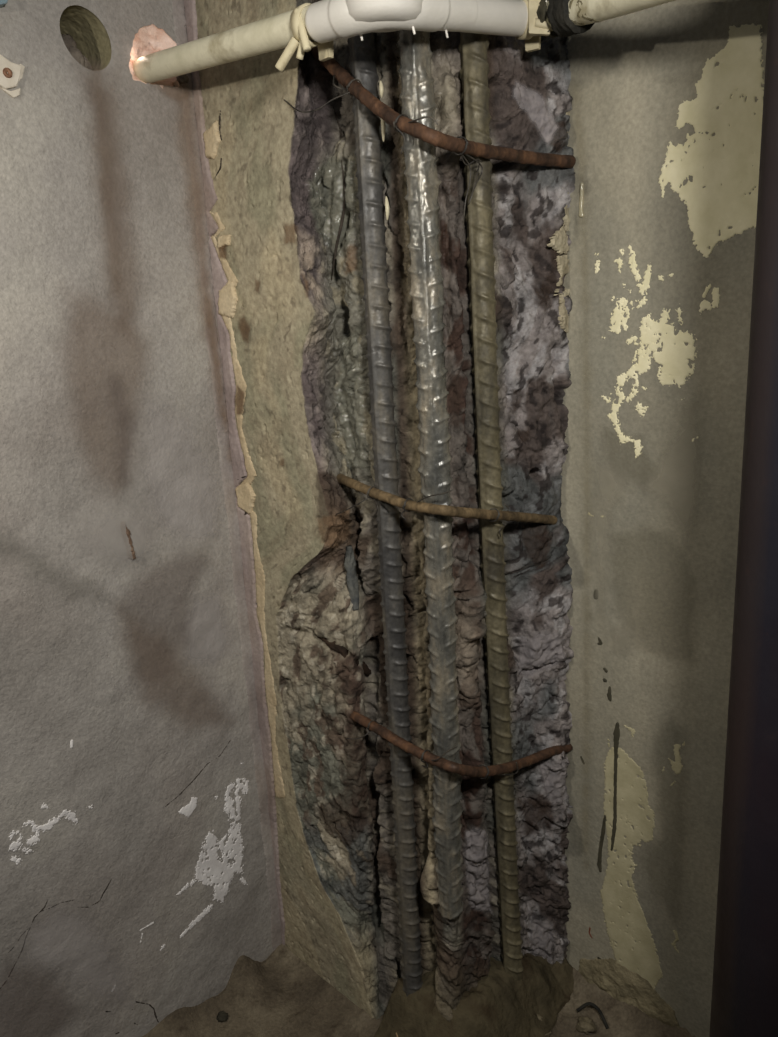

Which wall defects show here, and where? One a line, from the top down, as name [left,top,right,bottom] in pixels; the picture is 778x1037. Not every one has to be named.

spalling [430,31,464,139]
peeling [658,23,764,258]
peeling [601,245,698,458]
peeling [699,284,720,313]
spalling [129,0,402,1019]
spalling [379,117,503,1022]
spalling [487,34,575,965]
peeling [579,739,680,1029]